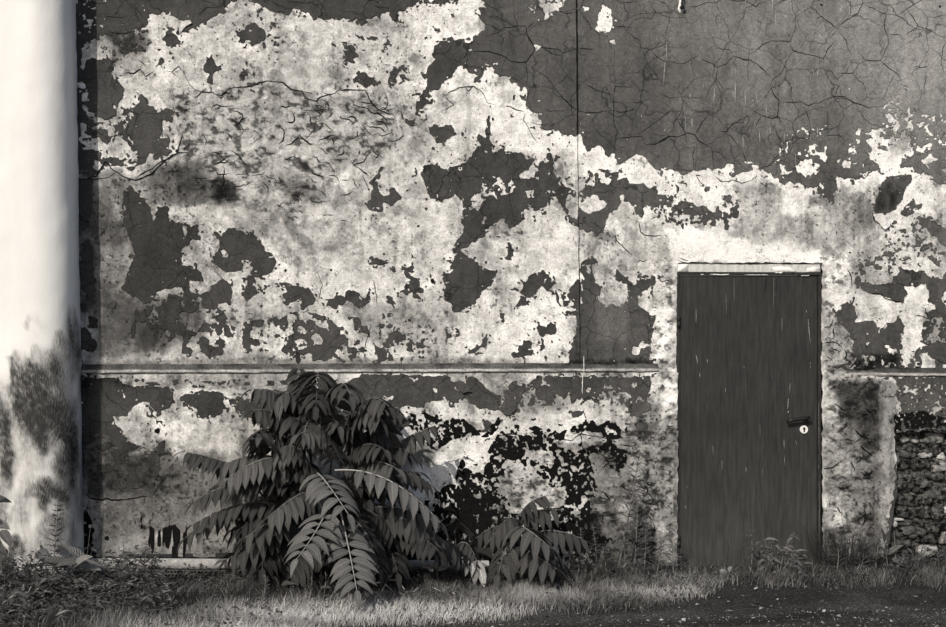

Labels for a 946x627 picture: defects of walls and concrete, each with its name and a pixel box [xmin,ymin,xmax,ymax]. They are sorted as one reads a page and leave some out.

peeling [528,0,565,26]
peeling [582,4,617,44]
crack [78,61,403,222]
crack [445,0,946,319]
peeling [775,137,793,178]
peeling [795,143,827,177]
peeling [837,128,862,168]
peeling [772,266,796,274]
peeling [920,351,935,368]
water stain [0,313,87,549]
peeling [81,373,302,558]
water stain [2,535,23,577]